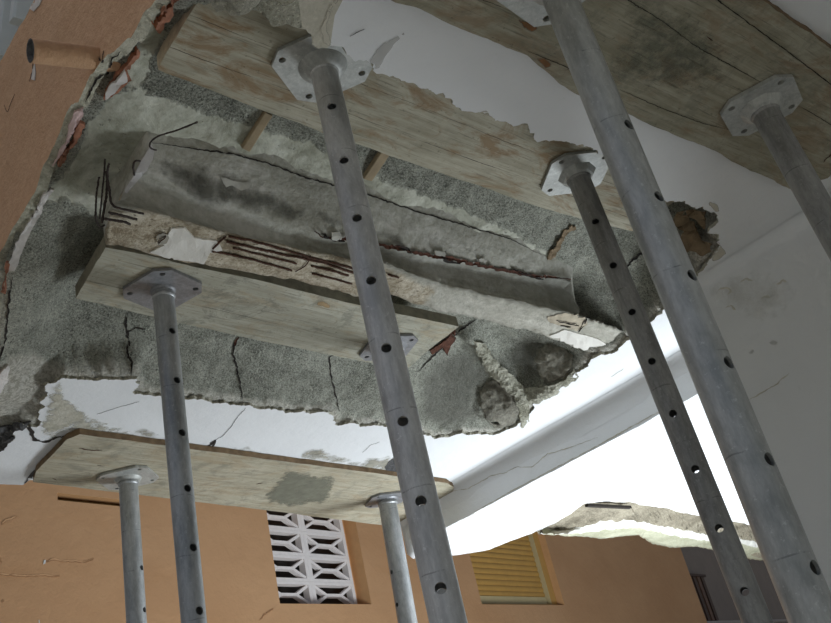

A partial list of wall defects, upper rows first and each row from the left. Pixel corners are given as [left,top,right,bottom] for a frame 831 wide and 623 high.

peeling [103,46,140,100]
peeling [1,187,54,294]
peeling [150,227,354,285]
crack [0,277,13,360]
crack [124,314,145,374]
peeling [547,313,606,350]
spalling [0,421,31,452]
peeling [43,384,114,434]
crack [208,337,243,447]
crack [328,355,340,411]
spalling [532,501,713,550]
spalling [732,521,763,561]